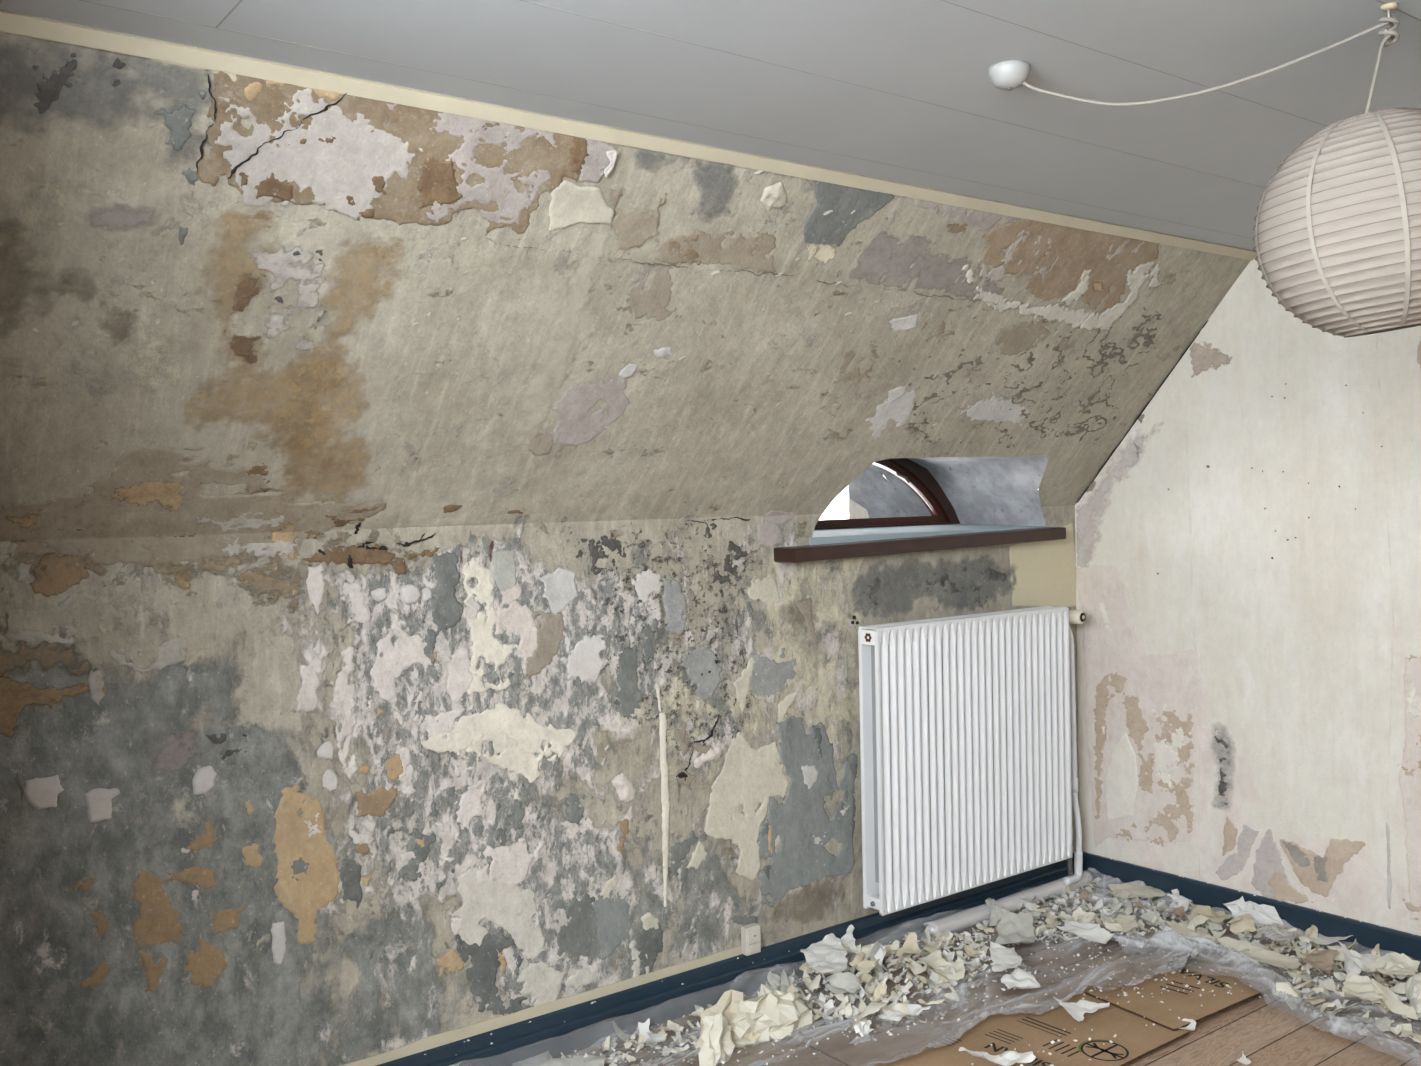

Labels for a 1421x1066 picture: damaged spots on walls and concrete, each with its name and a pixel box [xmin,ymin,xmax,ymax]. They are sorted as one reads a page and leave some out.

crack [196,74,347,179]
peeling [146,58,783,321]
peeling [795,180,895,264]
peeling [835,198,1161,356]
water stain [189,214,398,494]
spalling [866,385,916,439]
spalling [960,392,1029,426]
water stain [853,556,1016,615]
water stain [154,730,247,771]
peeling [0,447,858,1016]
water stain [1214,732,1231,807]
peeling [1215,816,1366,904]